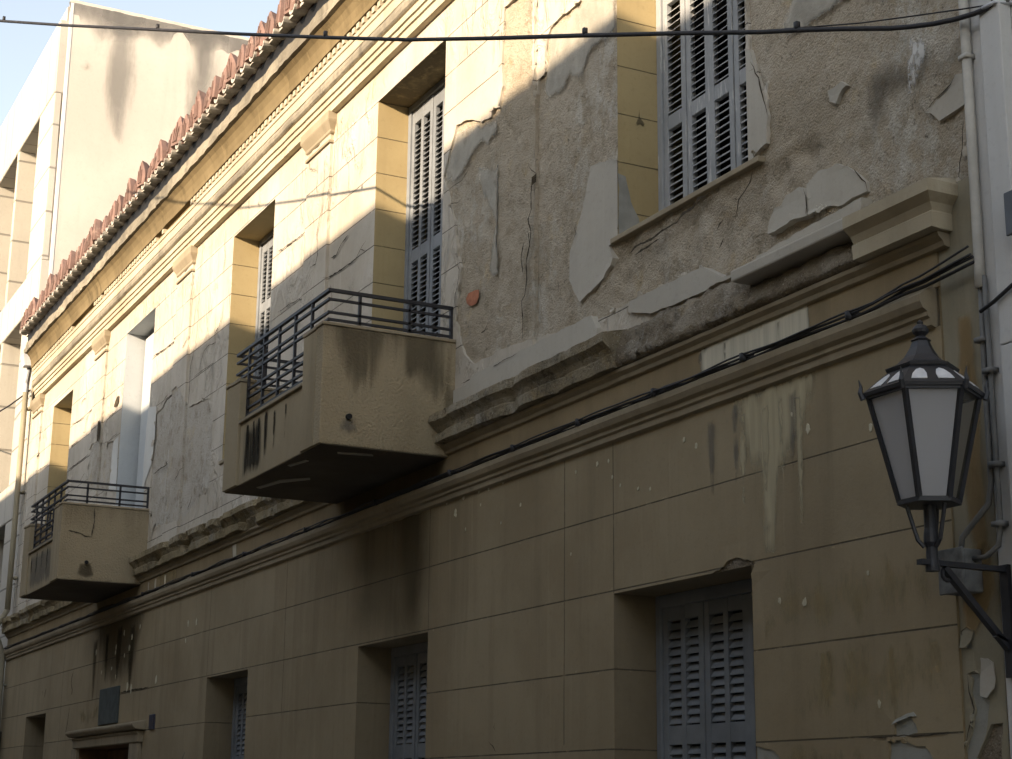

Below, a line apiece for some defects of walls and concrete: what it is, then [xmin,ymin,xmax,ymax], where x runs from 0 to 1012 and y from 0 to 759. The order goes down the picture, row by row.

damp [69,2,248,53]
spalling [445,0,969,363]
damp [244,405,286,473]
damp [735,373,813,551]
crack [68,508,95,537]
damp [93,614,138,682]
peeling [964,658,1003,759]